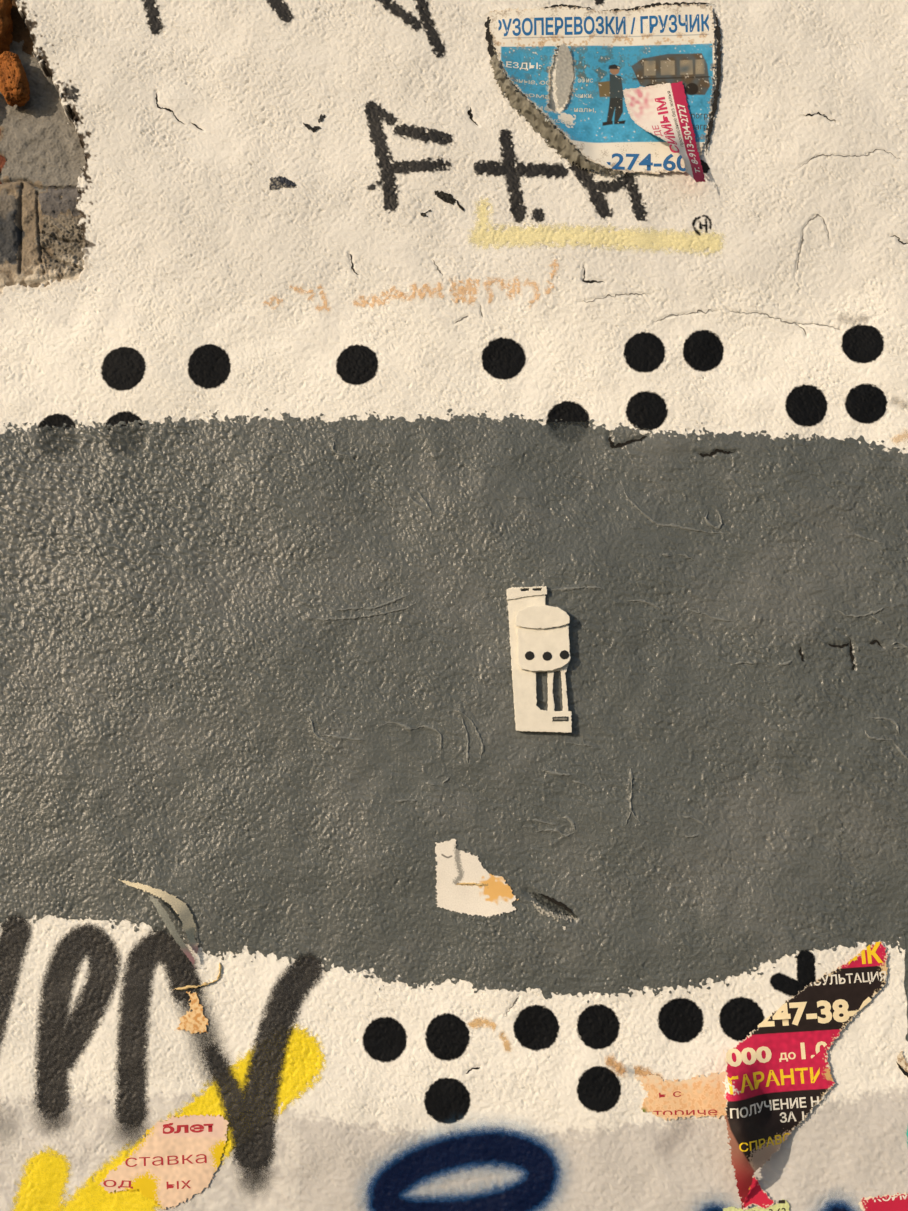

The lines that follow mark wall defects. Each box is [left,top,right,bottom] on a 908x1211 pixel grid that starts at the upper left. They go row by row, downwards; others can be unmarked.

flaking render [0,0,89,294]